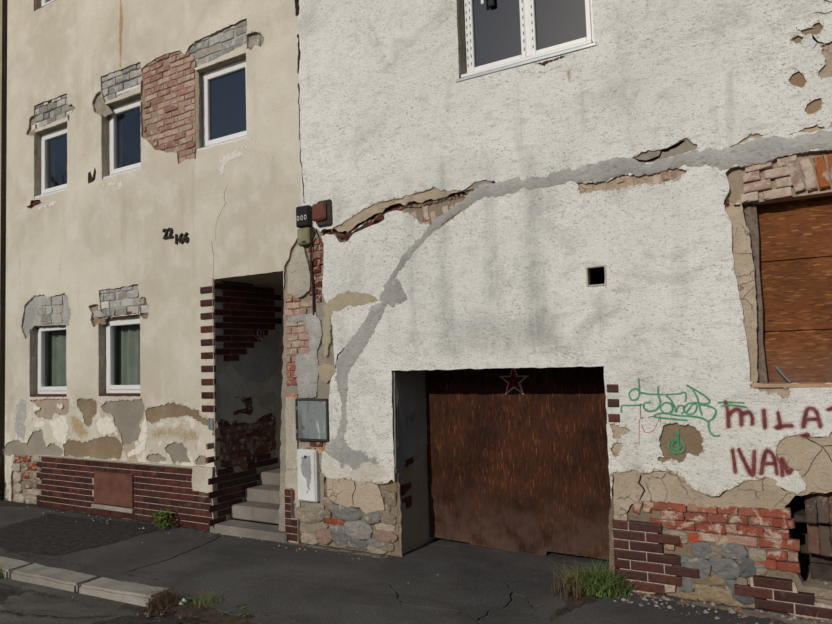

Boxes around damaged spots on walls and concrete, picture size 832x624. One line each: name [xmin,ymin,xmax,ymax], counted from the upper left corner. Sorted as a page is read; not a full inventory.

spalling [101,20,264,163]
spalling [789,70,807,88]
spalling [790,20,832,80]
spalling [805,99,824,114]
crack [323,180,495,240]
crack [637,142,683,163]
flaking render [741,155,818,206]
spalling [90,285,149,327]
spalling [279,228,402,557]
peeling [4,396,218,504]
spalling [608,421,832,609]
crack [0,610,112,618]